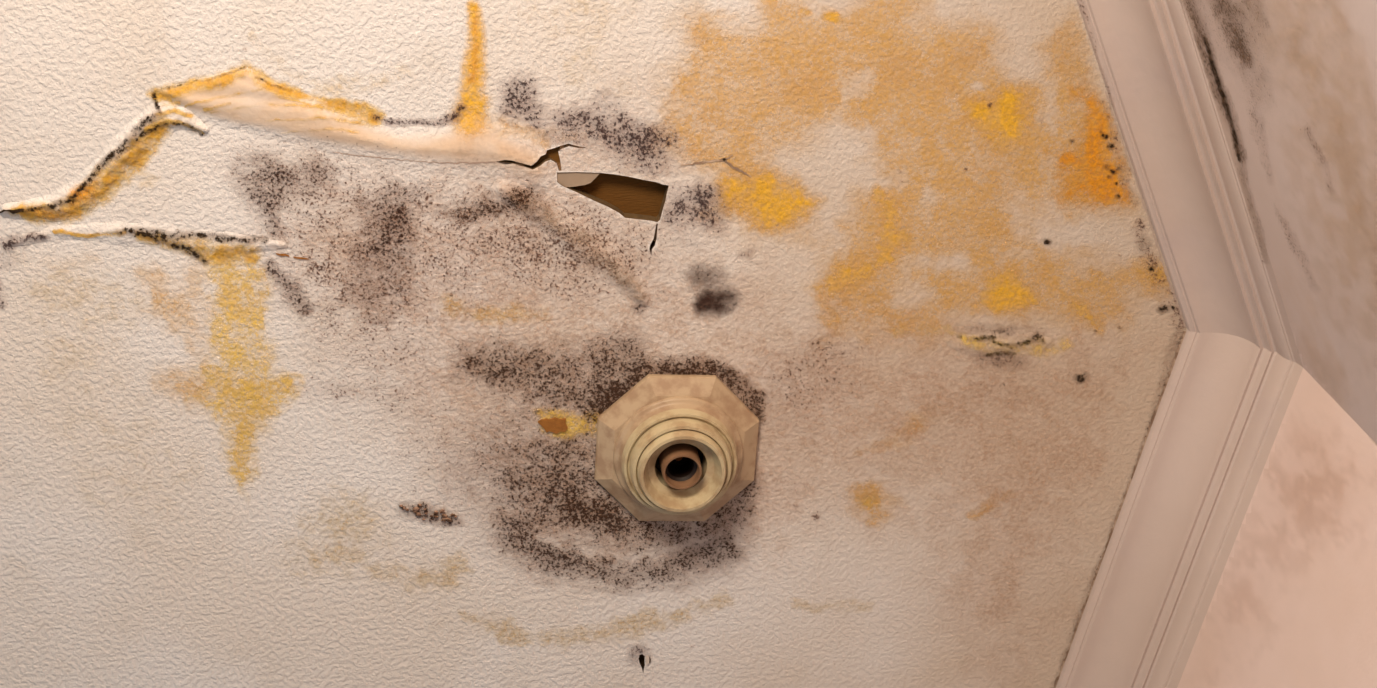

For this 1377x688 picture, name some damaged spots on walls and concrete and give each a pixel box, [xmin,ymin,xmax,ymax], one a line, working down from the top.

crack [0,207,24,215]
flaking render [557,172,669,222]
water stain [119,0,1183,593]
water stain [1184,0,1262,200]